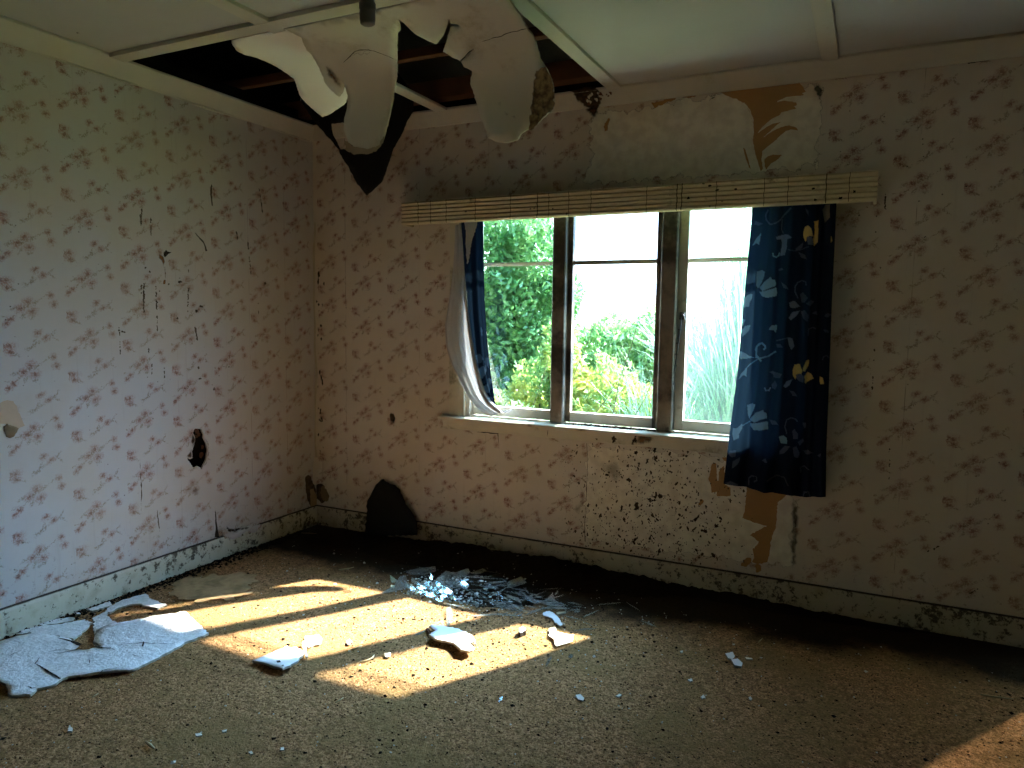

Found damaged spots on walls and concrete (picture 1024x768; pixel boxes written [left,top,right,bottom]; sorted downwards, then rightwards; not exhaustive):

peeling [571,85,614,116]
leakage [562,436,753,565]